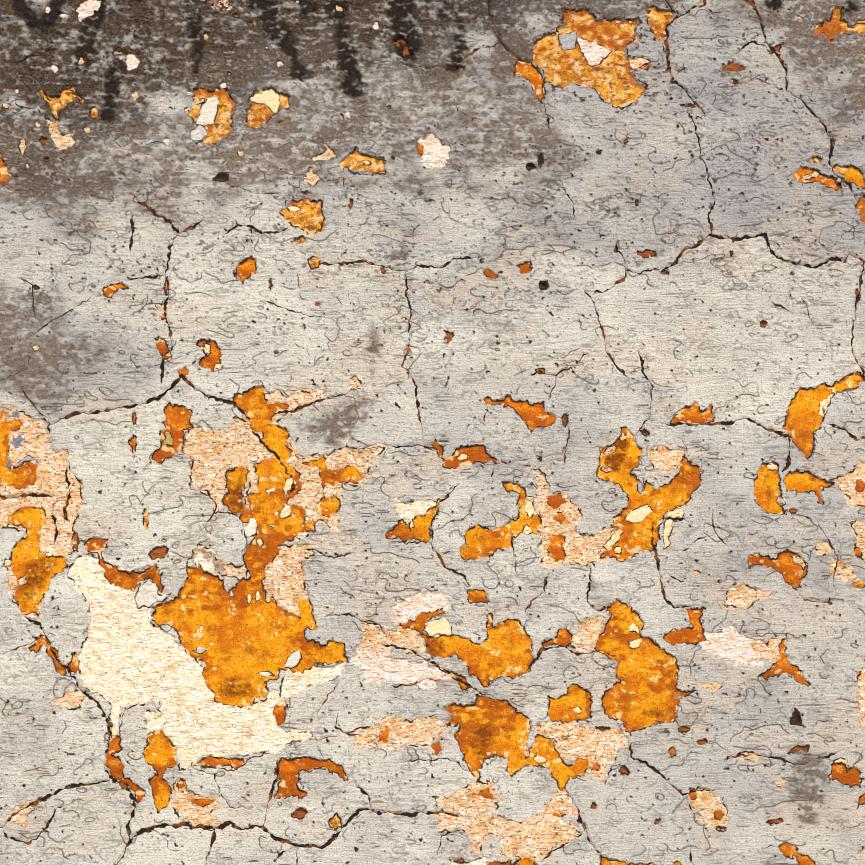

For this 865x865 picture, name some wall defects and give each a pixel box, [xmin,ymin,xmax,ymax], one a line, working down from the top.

water stain [0,0,682,233]
water stain [734,0,865,122]
water stain [0,294,102,406]
crack [0,195,352,497]
peeling [0,385,390,747]
water stain [366,333,380,362]
crack [320,256,472,451]
peeling [459,426,702,567]
crack [529,0,865,472]
peeling [754,371,865,515]
crack [0,613,483,865]
peeling [400,589,706,824]